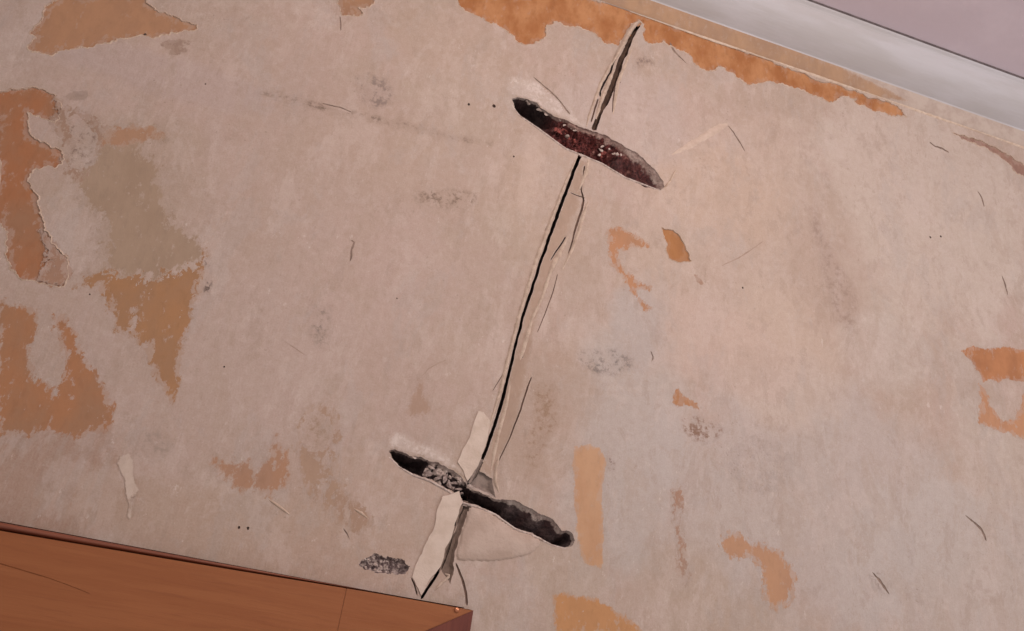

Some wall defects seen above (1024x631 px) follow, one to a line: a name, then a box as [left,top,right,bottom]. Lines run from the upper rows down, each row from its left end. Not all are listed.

peeling [26,0,198,57]
crack [586,20,640,130]
peeling [457,0,907,118]
peeling [0,86,214,405]
peeling [605,226,653,313]
peeling [661,227,704,285]
peeling [0,297,117,441]
crack [411,152,590,605]
peeling [961,345,1024,439]
peeling [571,443,607,569]
peeling [552,590,643,631]
peeling [717,528,798,614]